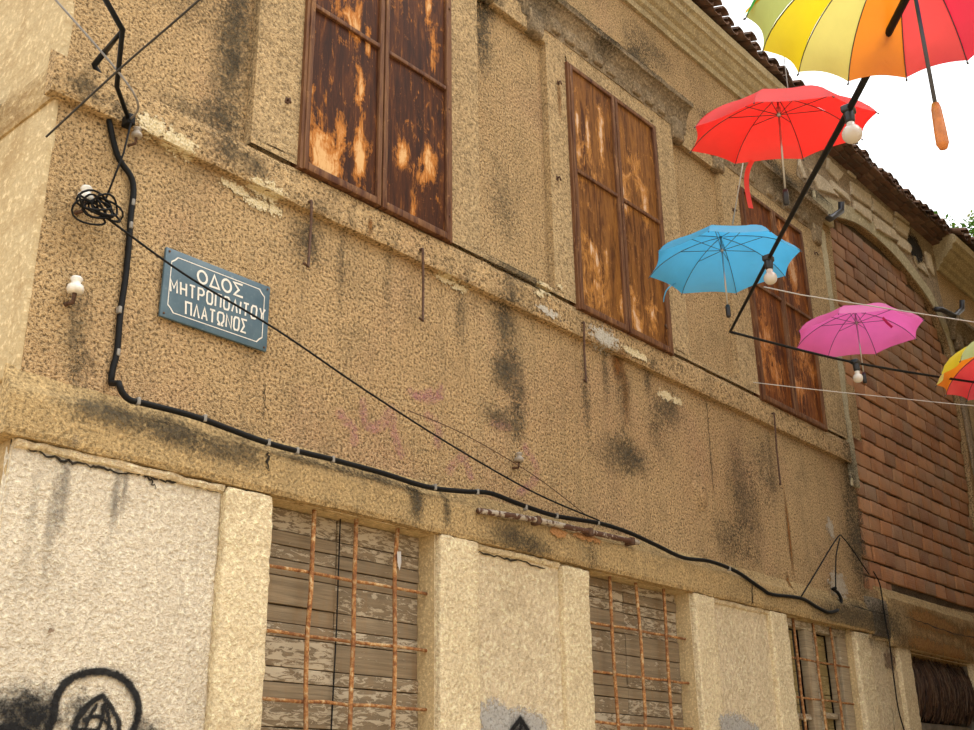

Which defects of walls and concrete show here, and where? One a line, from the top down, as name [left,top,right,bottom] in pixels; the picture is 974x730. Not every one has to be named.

water stain [178,0,267,177]
peeling [137,111,199,162]
peeling [219,175,289,218]
water stain [486,255,545,440]
water stain [596,398,648,476]
crack [28,449,219,493]
crack [478,551,545,569]